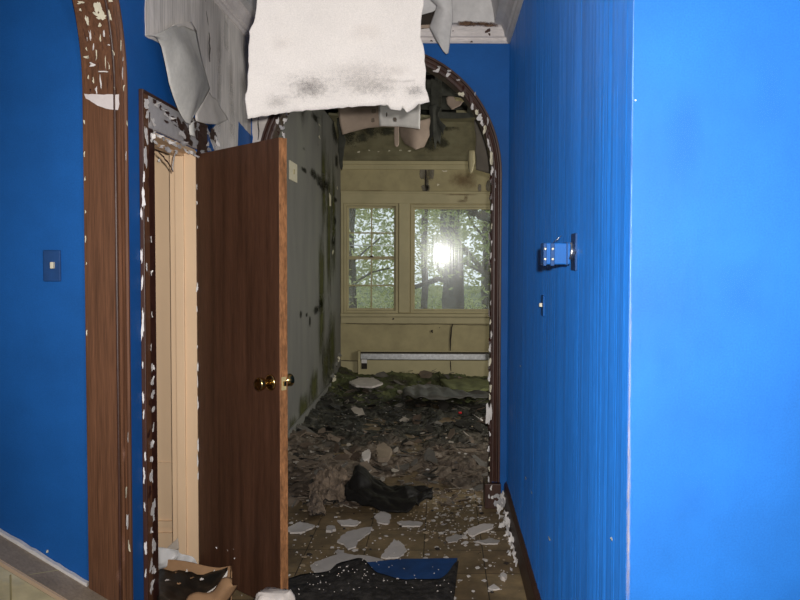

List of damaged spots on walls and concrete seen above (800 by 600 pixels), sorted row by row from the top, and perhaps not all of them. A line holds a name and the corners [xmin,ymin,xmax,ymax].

peeling [77,0,125,110]
flaking render [140,0,288,222]
damp [300,155,337,385]
flaking render [421,11,435,29]
peeling [433,66,496,272]
peeling [142,362,155,419]
peeling [143,424,156,593]
peeling [486,301,518,571]